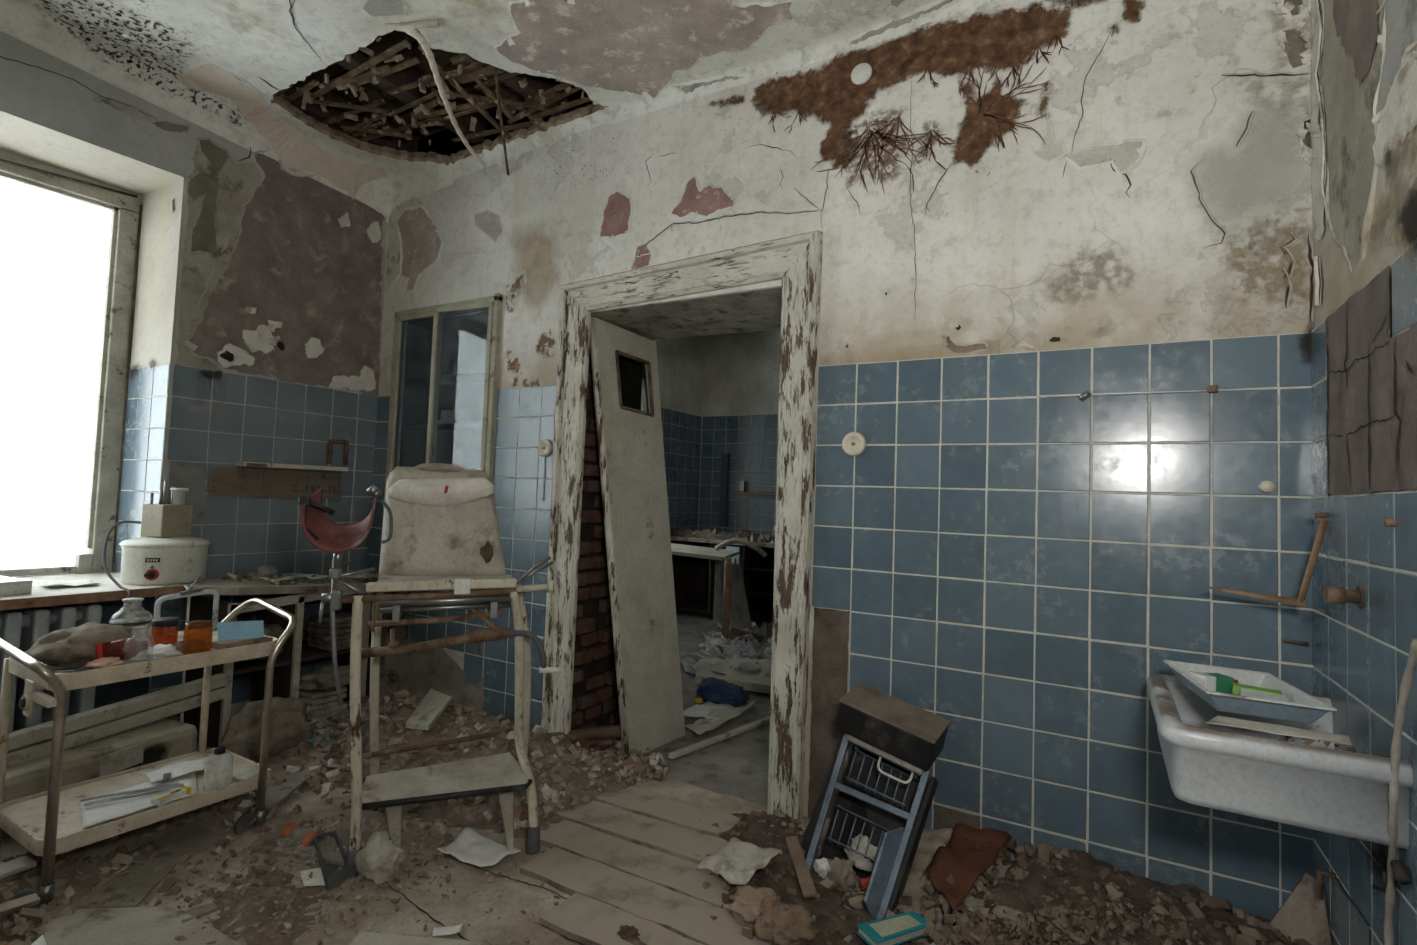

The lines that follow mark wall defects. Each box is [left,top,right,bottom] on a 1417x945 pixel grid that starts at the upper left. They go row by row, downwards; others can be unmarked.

water stain [41,0,242,127]
crack [289,0,323,63]
peeling [493,0,960,106]
peeling [93,97,444,396]
peeling [599,190,653,270]
peeling [670,175,735,220]
crack [631,144,861,269]
crack [910,83,952,321]
peeling [1034,107,1147,177]
crack [1190,158,1228,251]
crack [1221,0,1413,488]
peeling [1271,0,1417,495]